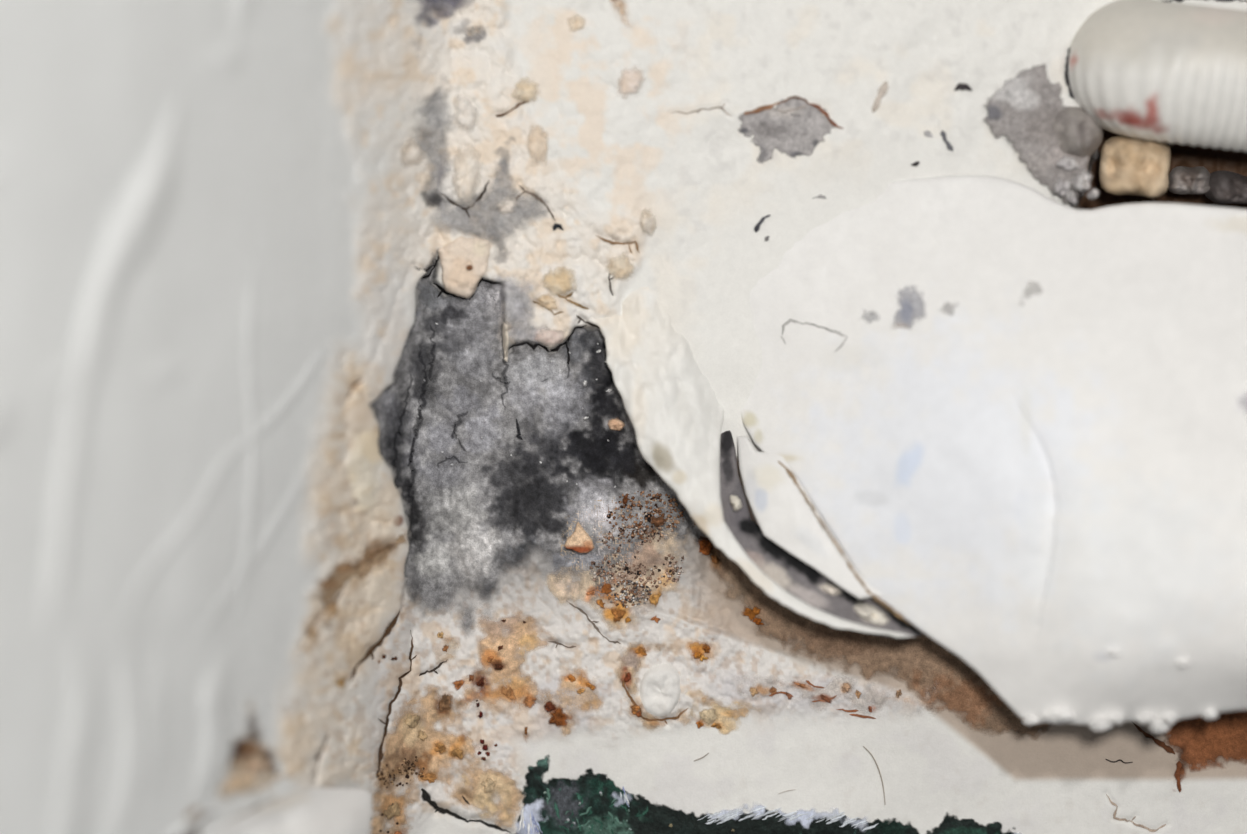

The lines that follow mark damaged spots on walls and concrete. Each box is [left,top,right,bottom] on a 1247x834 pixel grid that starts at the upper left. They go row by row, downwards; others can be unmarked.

spalling [739,96,844,163]
peeling [438,236,491,298]
peeling [346,268,426,666]
water stain [370,259,708,609]
crack [350,612,448,777]
water stain [462,610,472,629]
rust [548,490,1049,737]
rust [1132,710,1247,792]